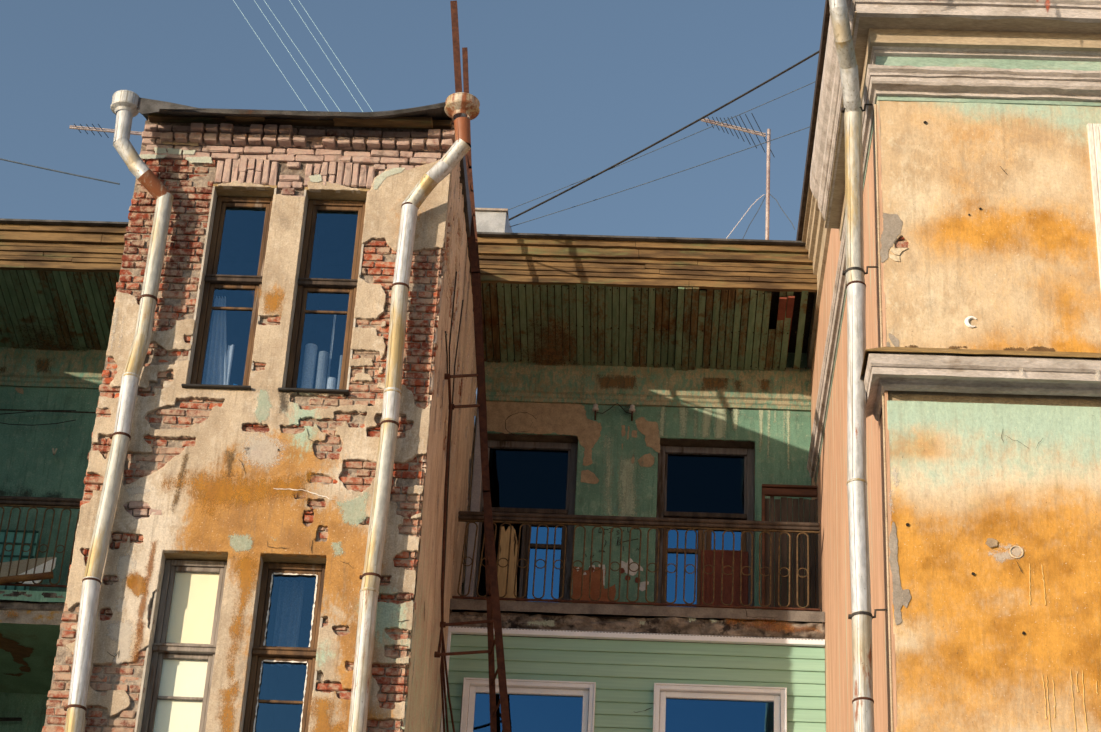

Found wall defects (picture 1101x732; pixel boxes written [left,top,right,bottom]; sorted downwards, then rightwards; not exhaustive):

flaking render [114,178,156,305]
flaking render [138,121,455,411]
flaking render [80,432,112,507]
flaking render [96,356,120,417]
flaking render [110,533,144,550]
flaking render [123,501,162,519]
flaking render [123,398,224,485]
leakage [162,433,313,516]
flaking render [242,240,397,557]
flaking render [889,520,911,625]
flaking render [0,599,80,732]
flaking render [366,628,412,732]